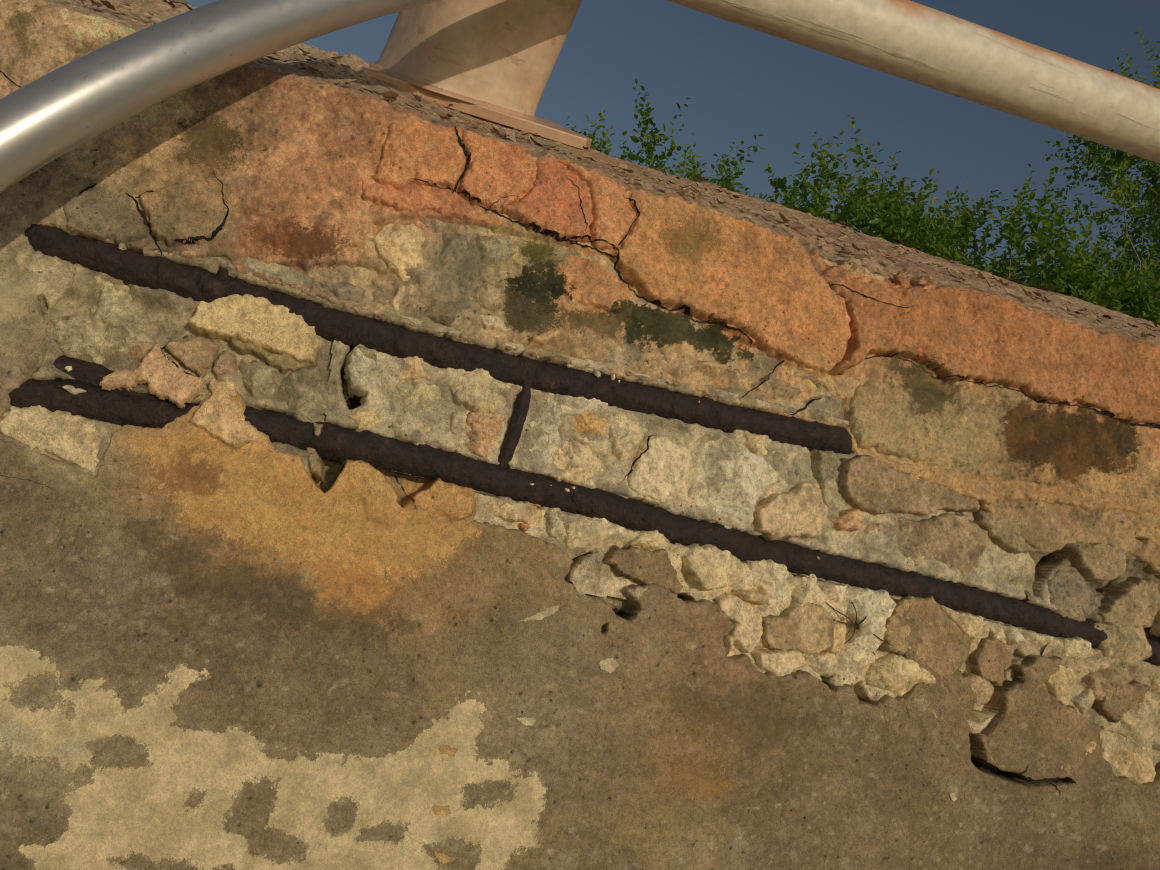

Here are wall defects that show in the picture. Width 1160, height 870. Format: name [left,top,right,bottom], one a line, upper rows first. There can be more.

crack [126,174,229,255]
rust [24,224,854,454]
rust [9,355,1108,648]
spalling [0,218,1160,785]
crack [412,126,753,347]
water stain [500,237,755,365]
peeling [261,46,1160,338]
crack [827,283,913,308]
crack [865,353,1160,429]
water stain [996,391,1144,492]
peeling [0,640,548,870]
rust [1143,637,1160,666]